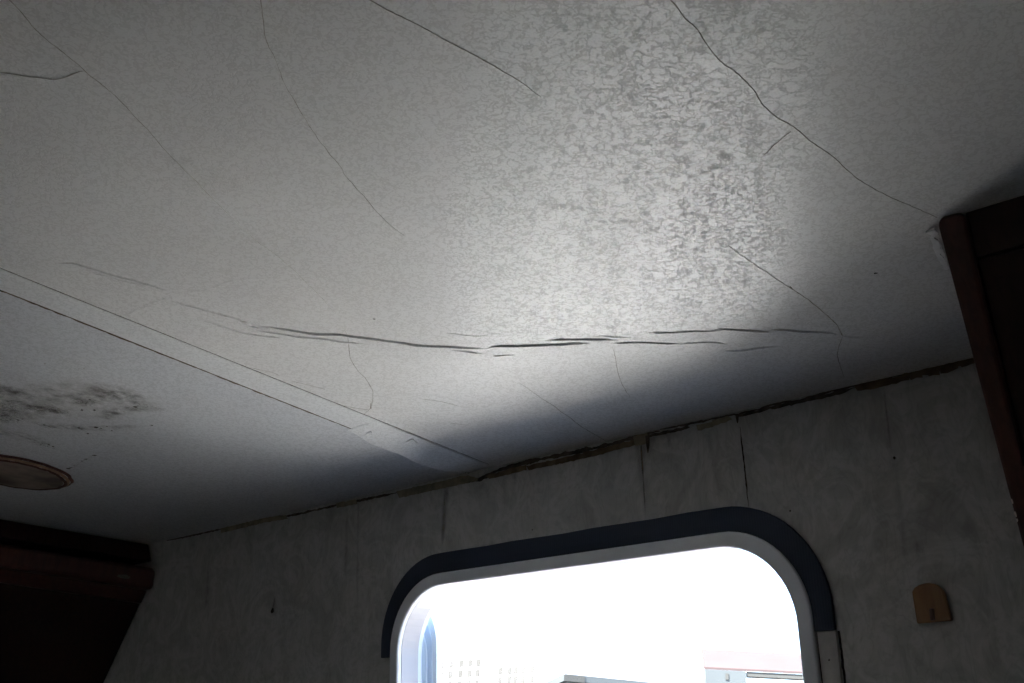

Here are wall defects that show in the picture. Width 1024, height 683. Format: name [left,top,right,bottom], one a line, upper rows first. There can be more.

crack [0,0,373,413]
crack [260,0,403,235]
crack [370,0,538,95]
crack [670,0,937,218]
crack [279,492,397,517]
peeling [347,421,488,475]
crack [469,245,920,507]